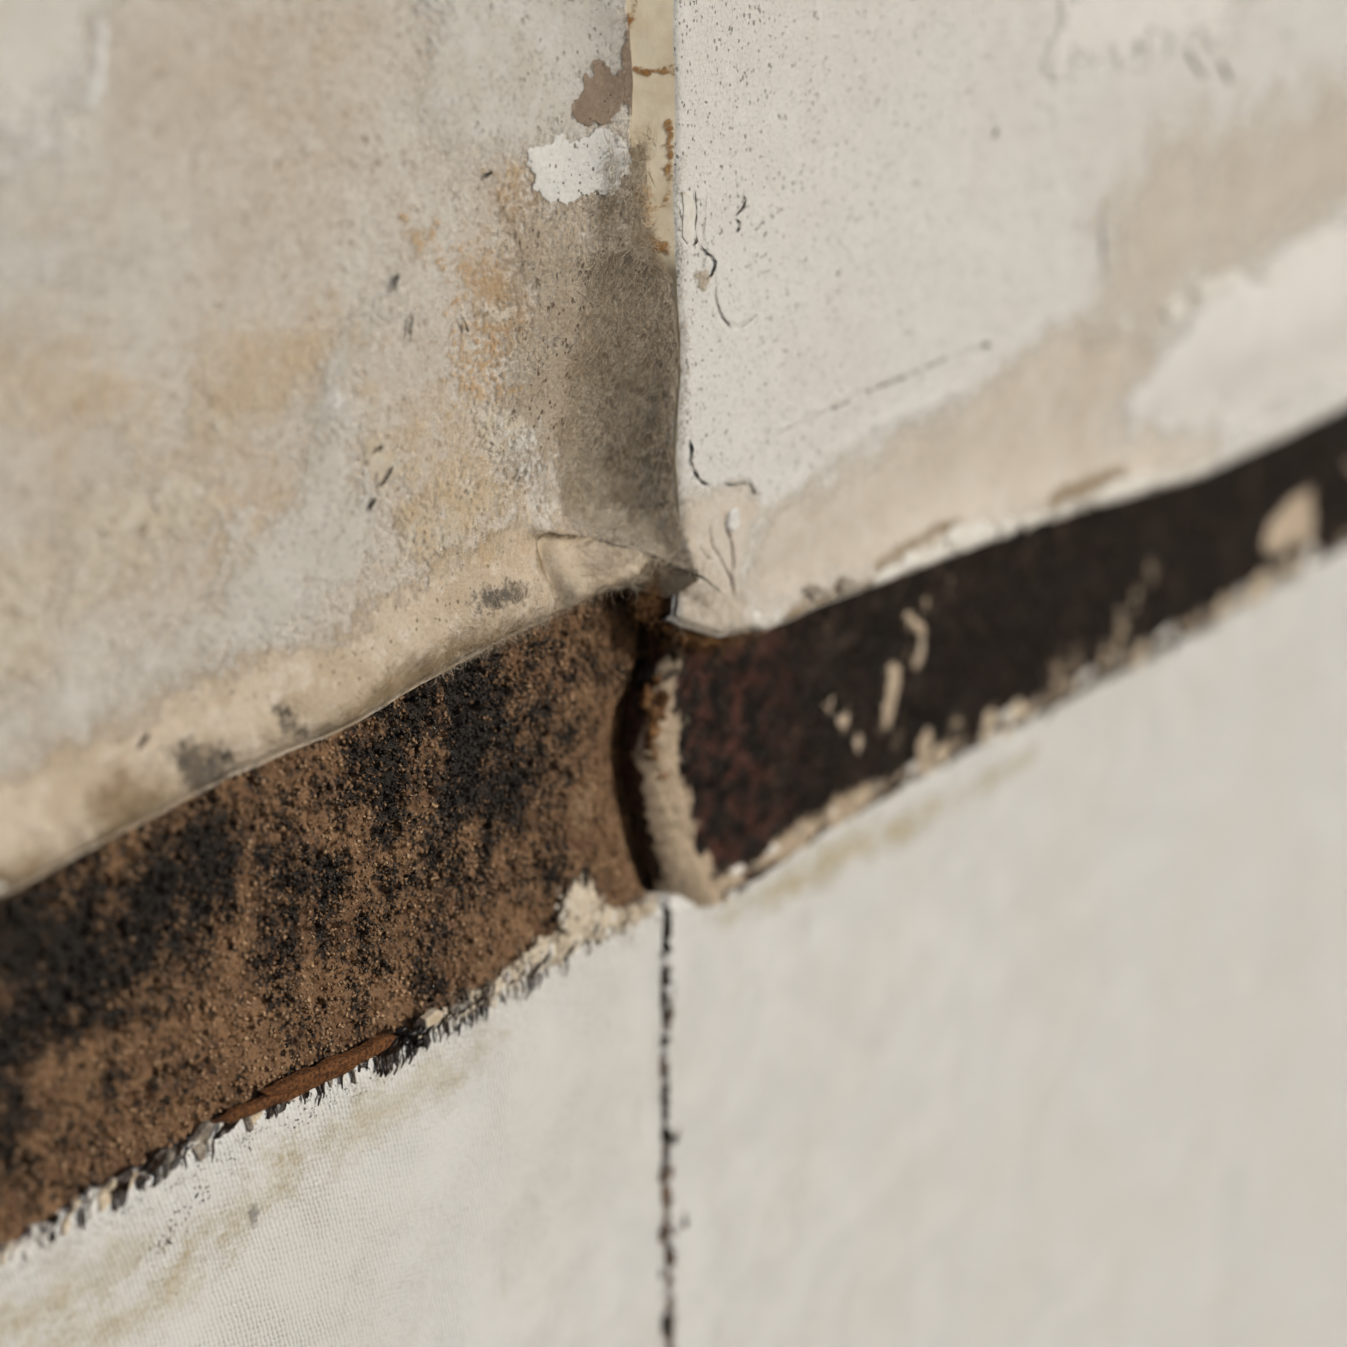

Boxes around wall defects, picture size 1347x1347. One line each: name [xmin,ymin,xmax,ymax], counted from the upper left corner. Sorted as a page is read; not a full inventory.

spalling [359,425,416,510]
peeling [393,0,674,571]
corrosion [632,119,674,255]
corrosion [632,64,675,76]
peeling [678,192,1347,636]
peeling [708,486,1316,908]
peeling [420,865,678,1041]
crack [658,881,688,1347]